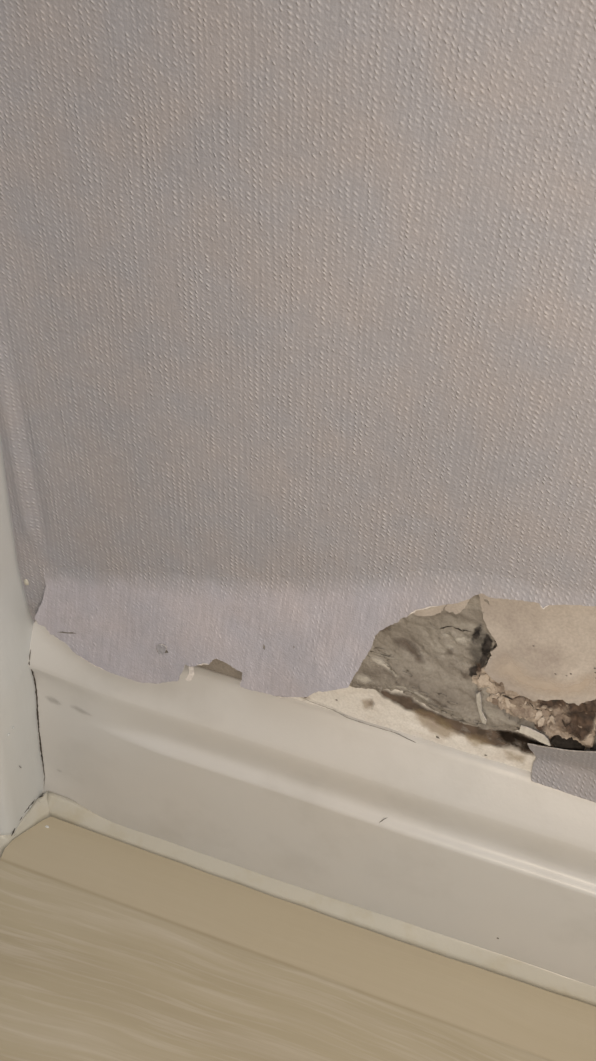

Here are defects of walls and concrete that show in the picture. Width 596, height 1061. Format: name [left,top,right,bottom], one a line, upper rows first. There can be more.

spalling [293,595,596,772]